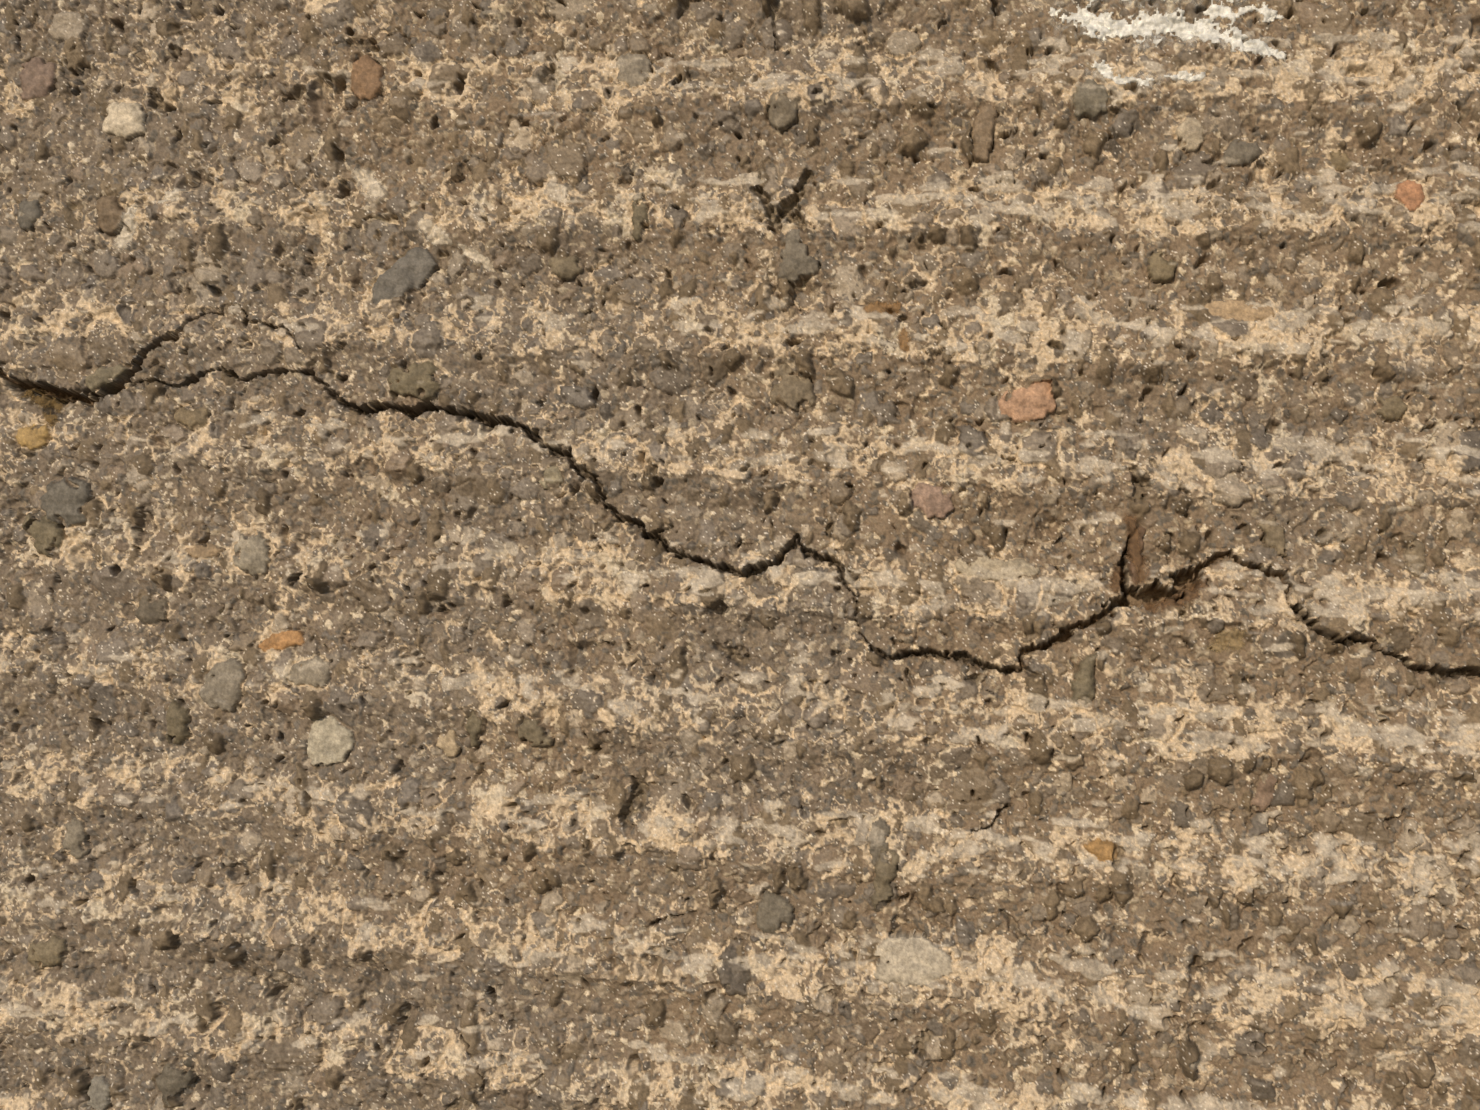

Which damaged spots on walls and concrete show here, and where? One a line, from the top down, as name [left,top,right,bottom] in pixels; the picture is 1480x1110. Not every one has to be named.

crack [0,301,1480,680]